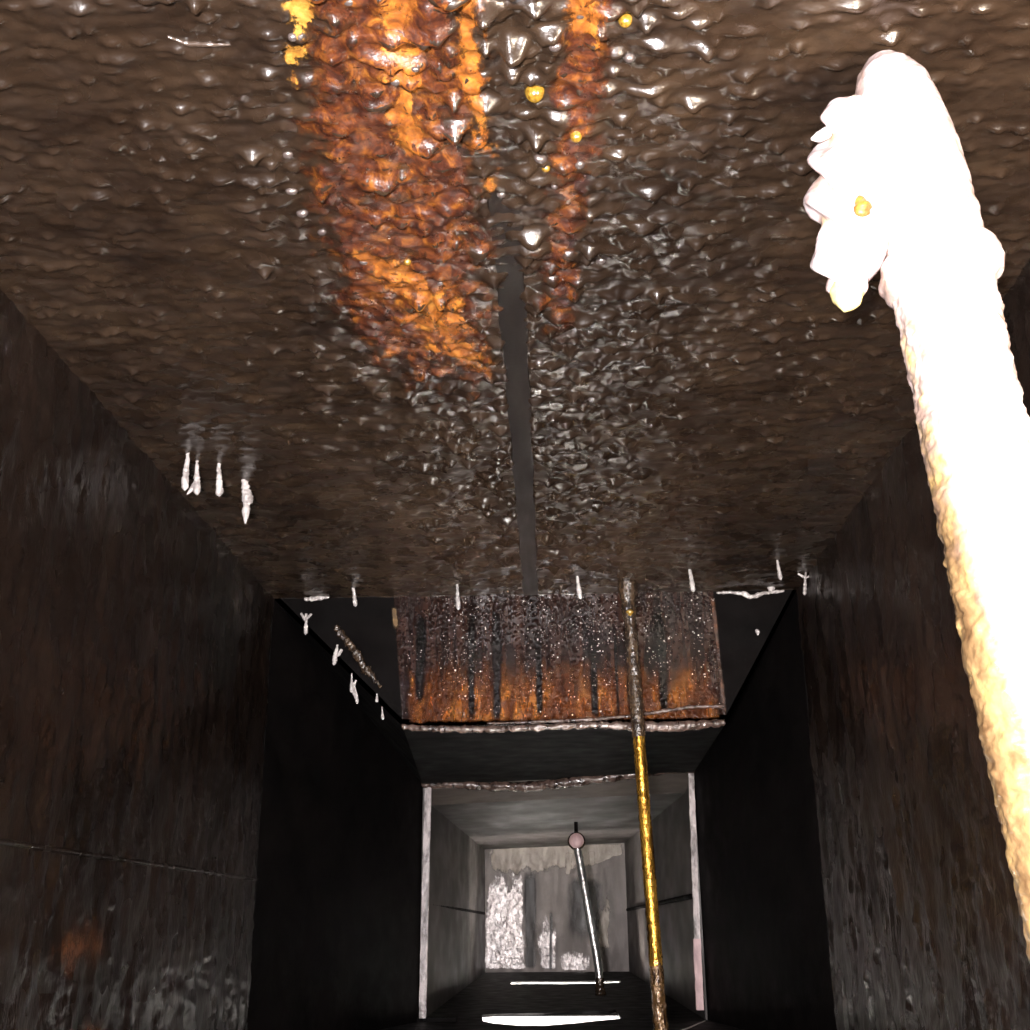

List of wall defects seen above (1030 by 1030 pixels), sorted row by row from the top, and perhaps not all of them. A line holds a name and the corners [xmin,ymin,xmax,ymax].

corrosion [282,0,497,399]
corrosion [538,0,619,339]
corrosion [405,594,726,723]